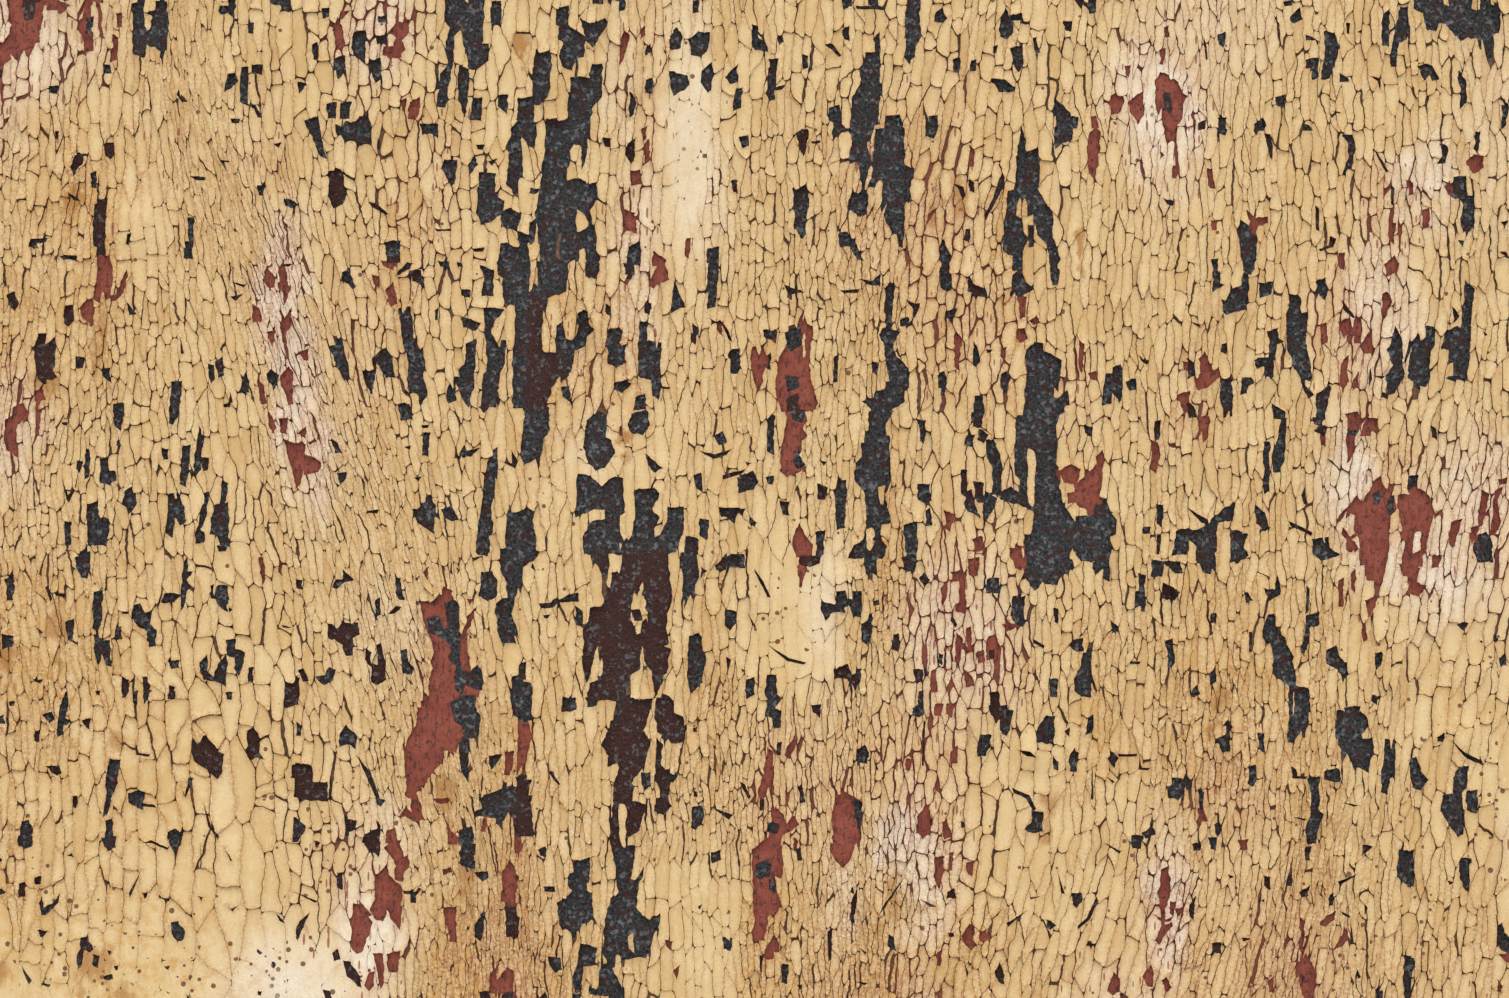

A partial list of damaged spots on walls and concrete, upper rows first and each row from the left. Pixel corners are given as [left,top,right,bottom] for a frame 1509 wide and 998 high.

peeling [0,0,172,99]
peeling [219,0,294,121]
peeling [102,140,115,161]
crack [954,164,1007,220]
crack [701,449,750,479]
peeling [294,0,1228,998]
peeling [0,151,390,998]
crack [726,570,806,674]
crack [357,756,380,798]
crack [1012,750,1036,811]
crack [106,778,232,901]
crack [992,875,1098,929]